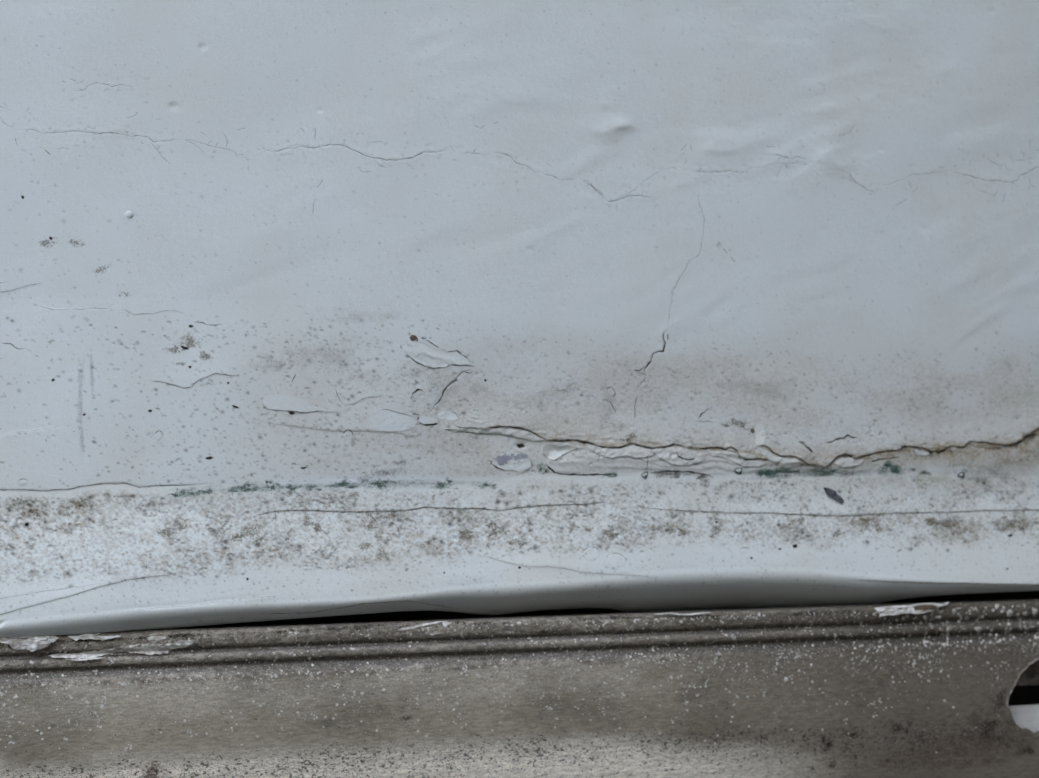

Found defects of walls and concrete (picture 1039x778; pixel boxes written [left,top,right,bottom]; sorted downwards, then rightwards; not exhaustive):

peeling [401,335,474,369]
peeling [354,396,459,431]
peeling [542,442,578,461]
leakage [756,469,798,477]
leakage [228,481,357,492]
peeling [874,602,949,617]
peeling [0,632,120,652]